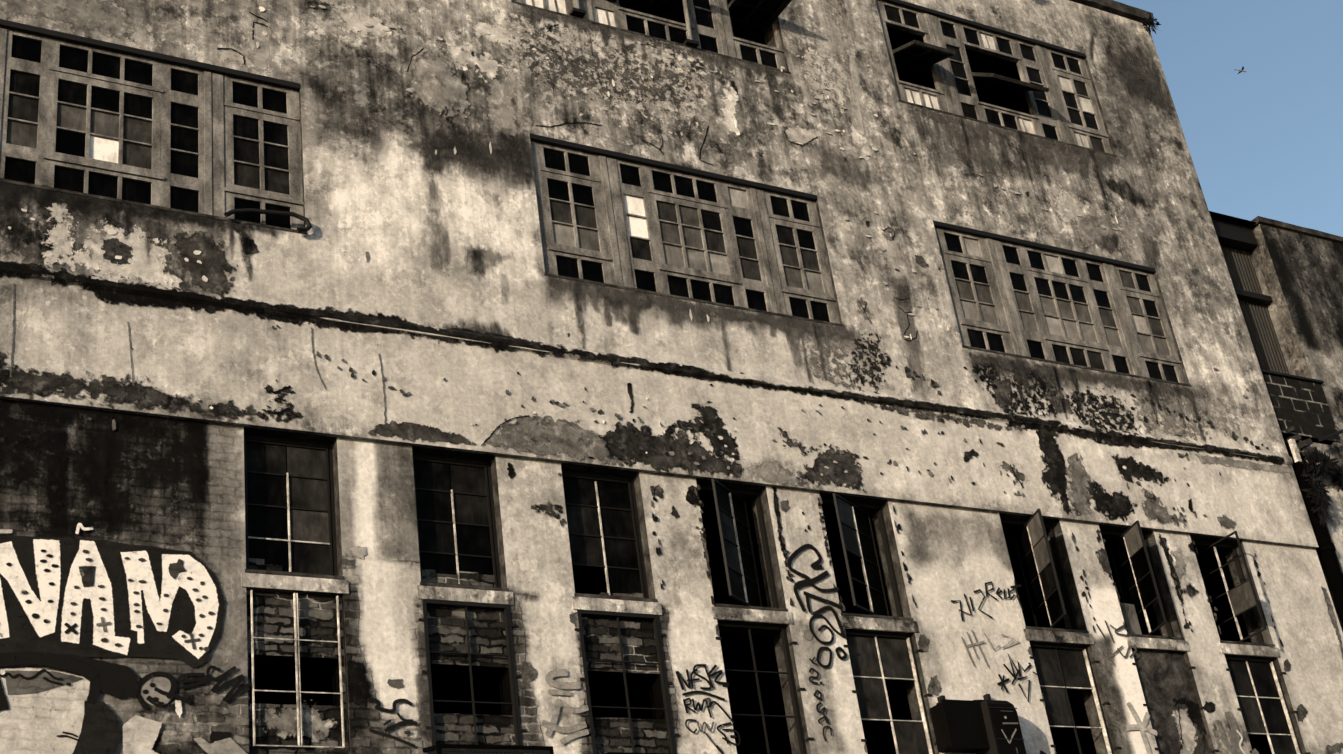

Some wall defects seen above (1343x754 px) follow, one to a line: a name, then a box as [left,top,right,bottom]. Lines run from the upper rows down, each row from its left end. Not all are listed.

peeling [0,0,136,43]
water stain [0,177,277,281]
peeling [21,203,260,298]
water stain [422,129,536,276]
water stain [0,260,1285,465]
water stain [0,352,303,527]
peeling [368,383,868,605]
peeling [798,298,1291,632]
spalling [1284,426,1318,458]
flaking render [569,612,579,628]
flaking render [918,634,929,652]
flaking render [1254,553,1291,672]